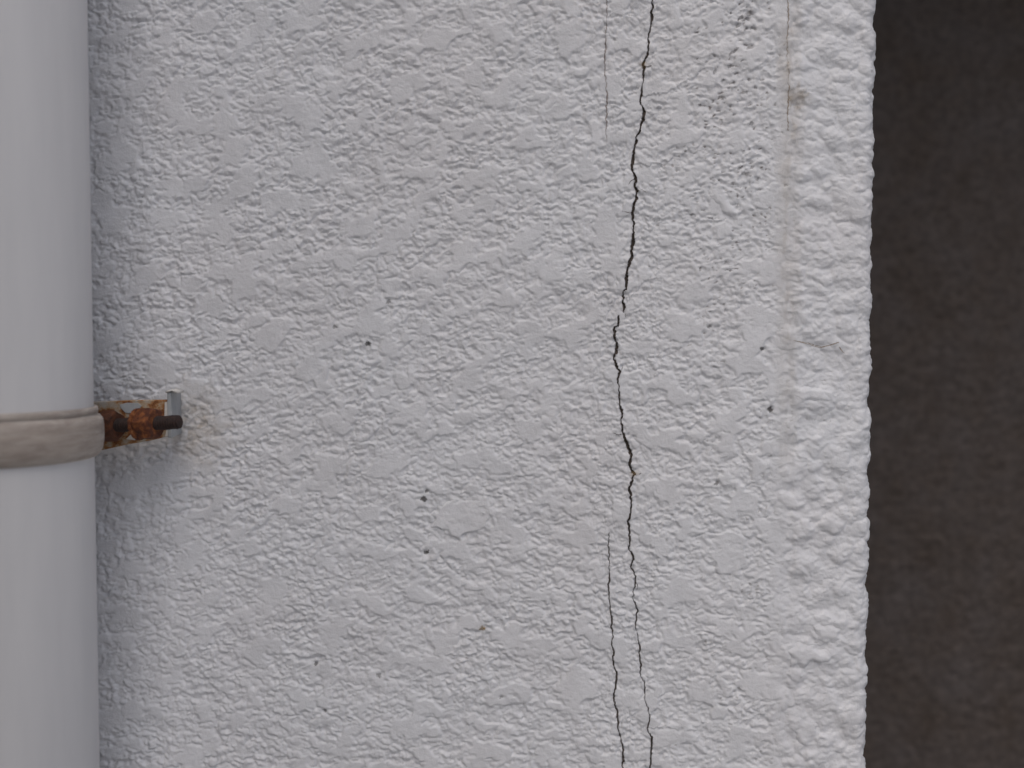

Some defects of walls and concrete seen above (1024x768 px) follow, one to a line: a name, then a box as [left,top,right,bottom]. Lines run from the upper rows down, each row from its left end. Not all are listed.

crack [602,0,610,143]
crack [607,0,654,768]